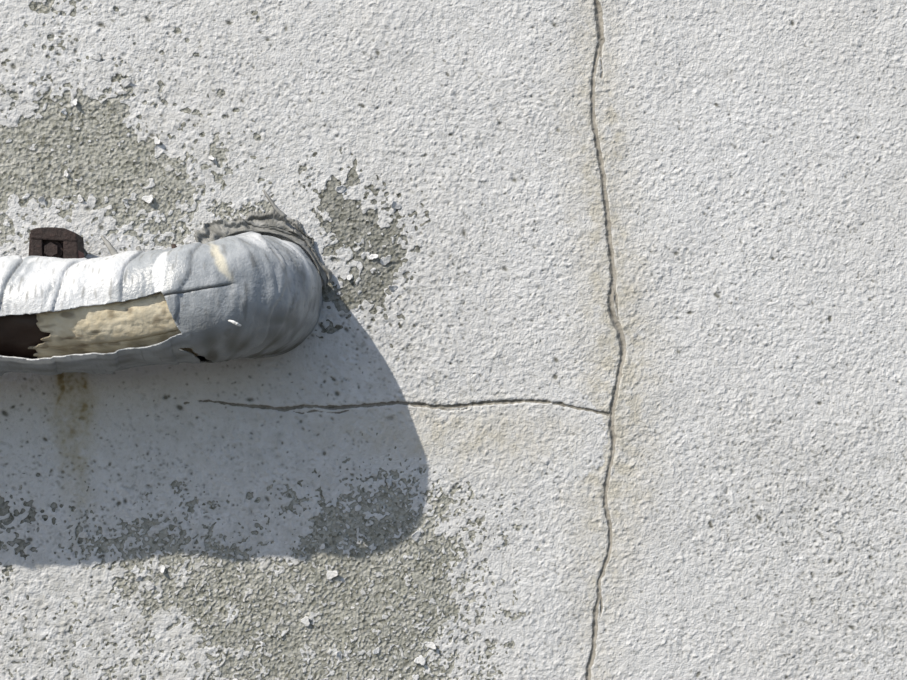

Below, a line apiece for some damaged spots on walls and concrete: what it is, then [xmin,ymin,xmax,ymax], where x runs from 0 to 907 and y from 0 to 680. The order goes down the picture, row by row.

peeling [0,0,277,257]
peeling [298,149,431,338]
crack [184,0,626,680]
peeling [0,446,526,680]